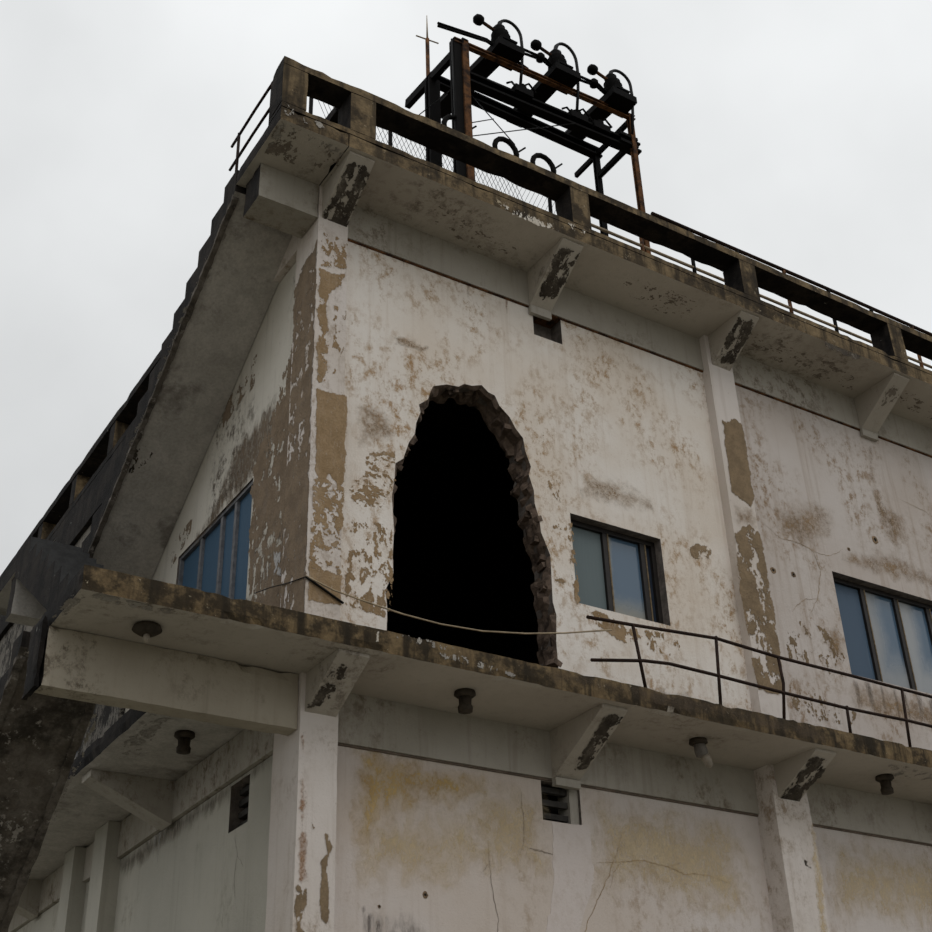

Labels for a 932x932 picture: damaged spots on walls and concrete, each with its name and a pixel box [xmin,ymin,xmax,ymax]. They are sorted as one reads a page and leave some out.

peeling [265,105,370,227]
spalling [505,205,552,228]
peeling [171,232,580,670]
peeling [722,418,755,507]
peeling [575,714,623,770]
peeling [781,757,826,801]
peeling [294,884,307,932]
peeling [319,833,333,924]
crack [585,836,723,932]